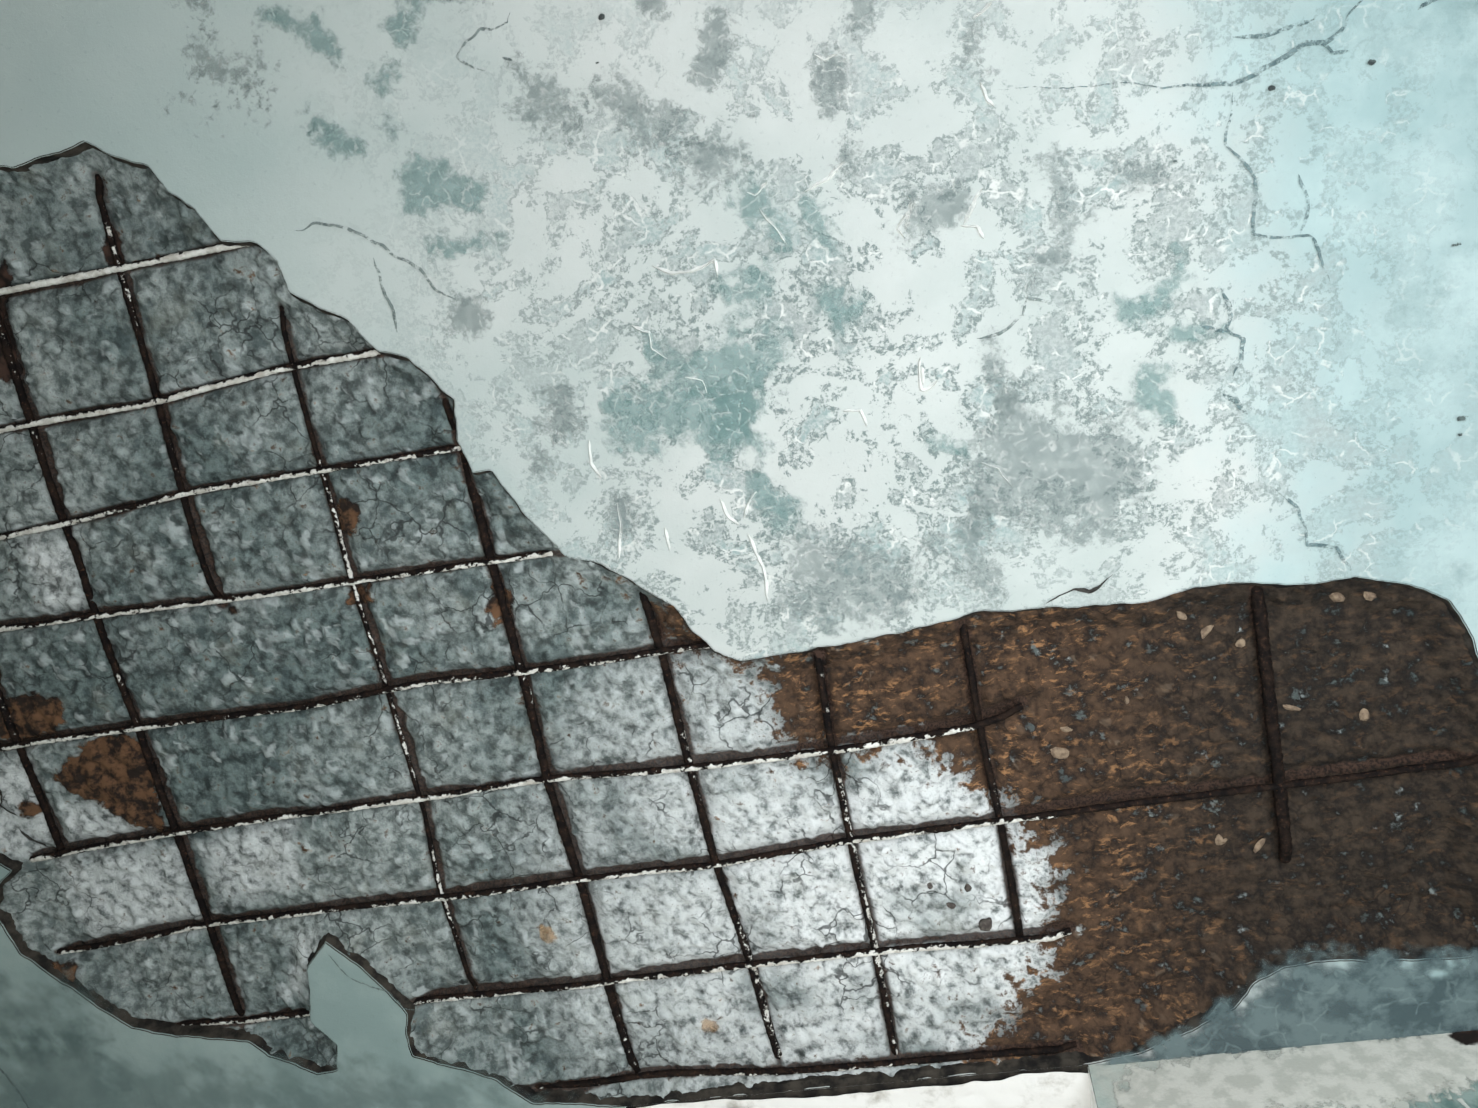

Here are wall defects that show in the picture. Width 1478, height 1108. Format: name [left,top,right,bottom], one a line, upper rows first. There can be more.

crack [1006,1,1362,281]
rust [0,259,25,384]
spalling [0,140,495,625]
crack [296,222,456,331]
peeling [599,258,791,460]
crack [1202,290,1246,414]
crack [1275,489,1348,565]
rust [0,691,66,741]
rust [53,733,165,832]
spalling [0,462,1478,1108]
leakage [1107,947,1478,1108]
rust [1449,1030,1478,1045]